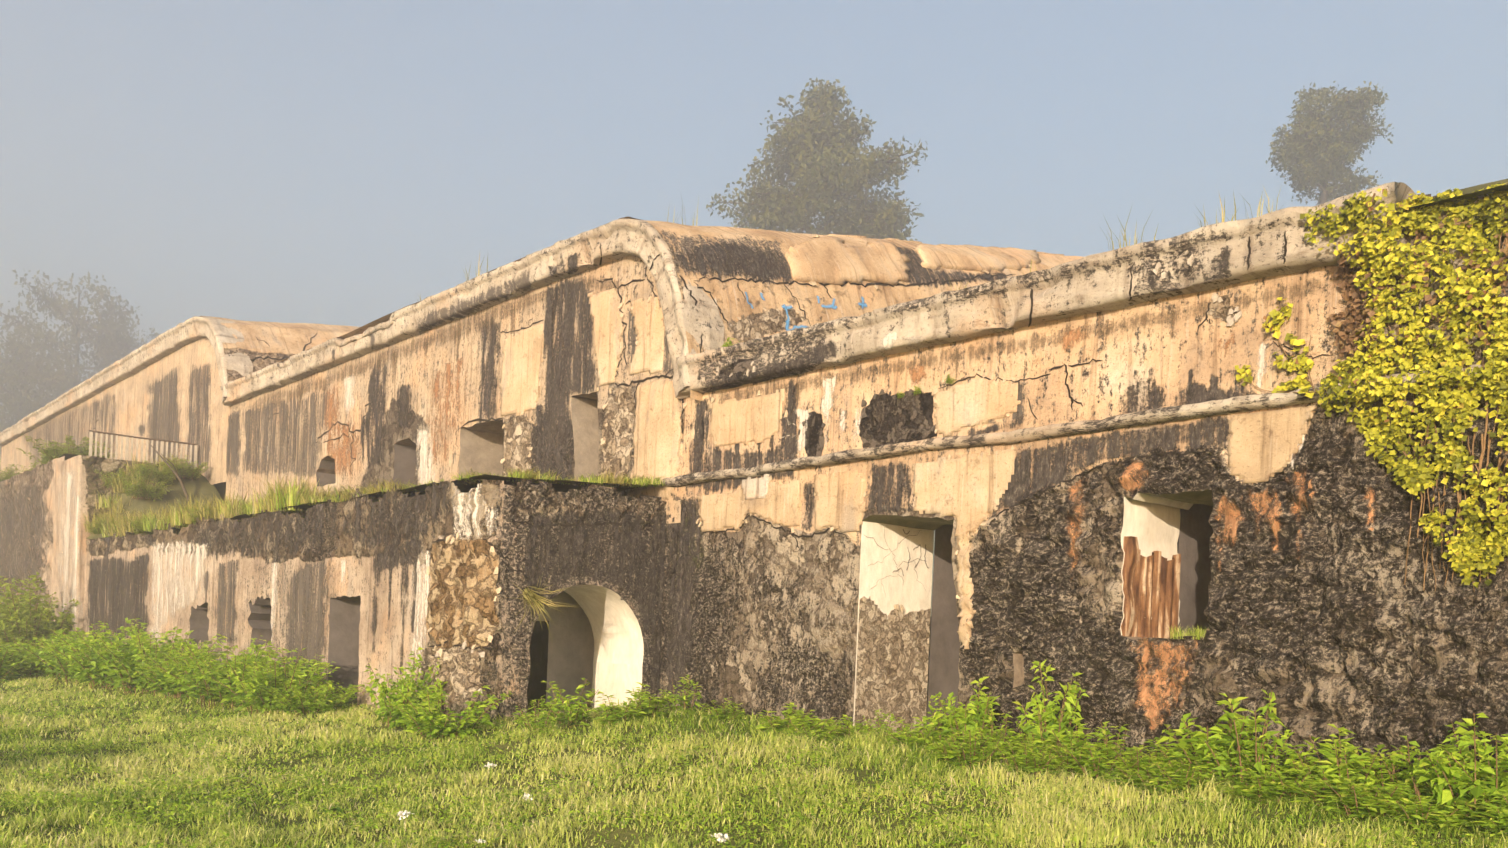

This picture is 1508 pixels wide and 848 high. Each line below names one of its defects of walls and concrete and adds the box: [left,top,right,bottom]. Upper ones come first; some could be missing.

leakage [898,247,1007,288]
leakage [0,253,622,675]
leakage [523,300,1211,700]
spalling [858,377,1021,448]
flaking render [911,445,1016,649]
crack [938,359,1103,420]
leakage [989,343,1270,519]
corrosion [1119,462,1148,490]
corrosion [1215,471,1315,571]
flaking render [1227,405,1317,484]
spalling [417,533,501,712]
corrosion [1131,638,1198,730]